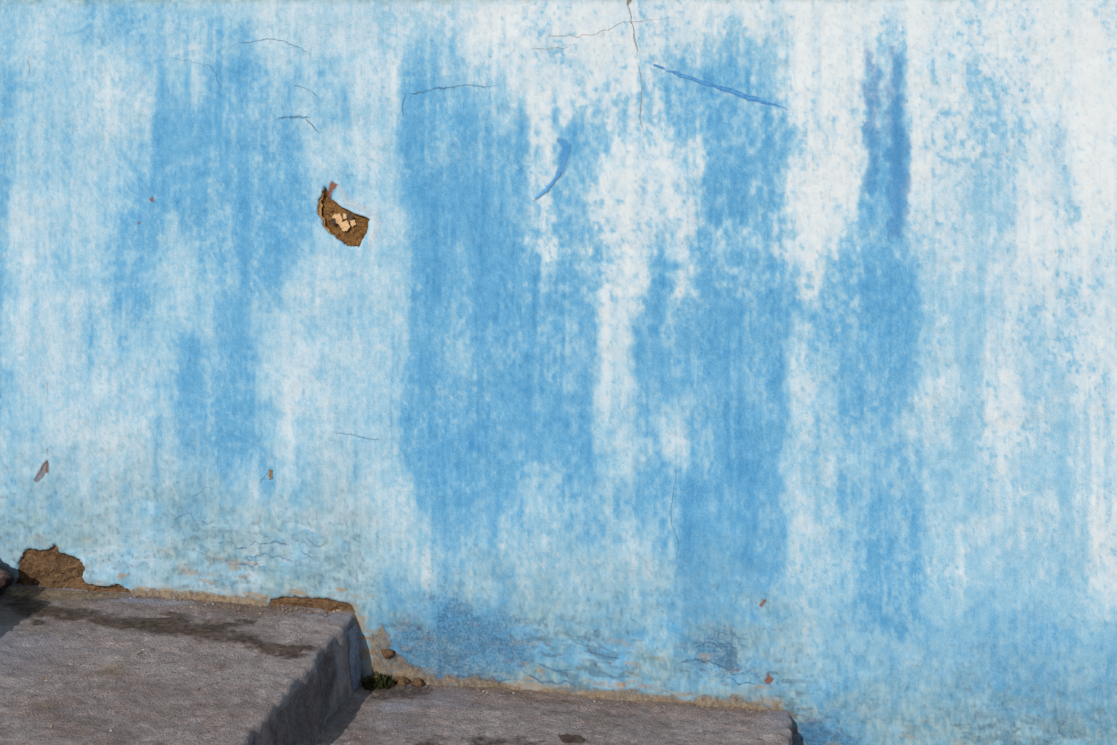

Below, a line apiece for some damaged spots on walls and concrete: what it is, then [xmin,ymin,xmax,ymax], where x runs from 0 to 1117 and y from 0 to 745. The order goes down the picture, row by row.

spalling [317,186,370,247]
spalling [16,545,130,593]
peeling [212,515,361,613]